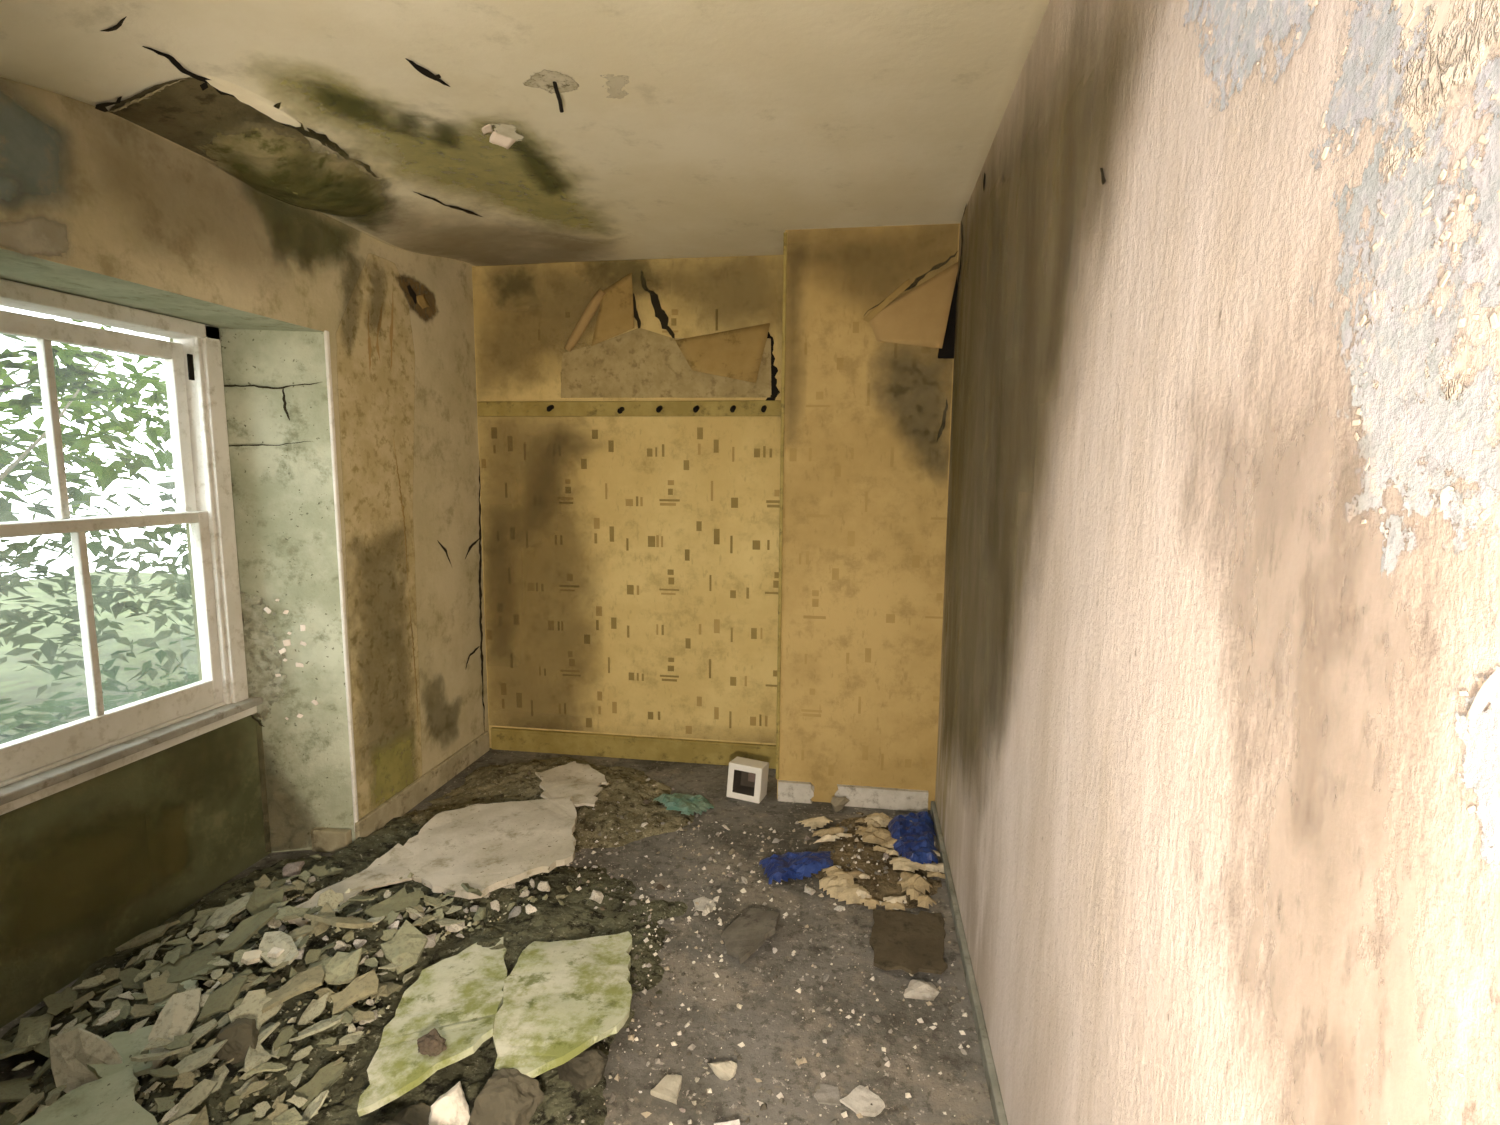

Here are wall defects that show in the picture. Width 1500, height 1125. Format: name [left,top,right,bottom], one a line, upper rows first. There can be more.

crack [101,16,380,178]
damp [228,158,386,261]
crack [405,58,450,87]
damp [279,78,601,230]
crack [413,191,482,217]
peeling [1183,0,1320,111]
spalling [396,276,438,322]
peeling [1309,0,1500,577]
crack [224,382,320,446]
damp [886,23,1130,770]
damp [1221,411,1428,1125]
peeling [1453,665,1500,865]